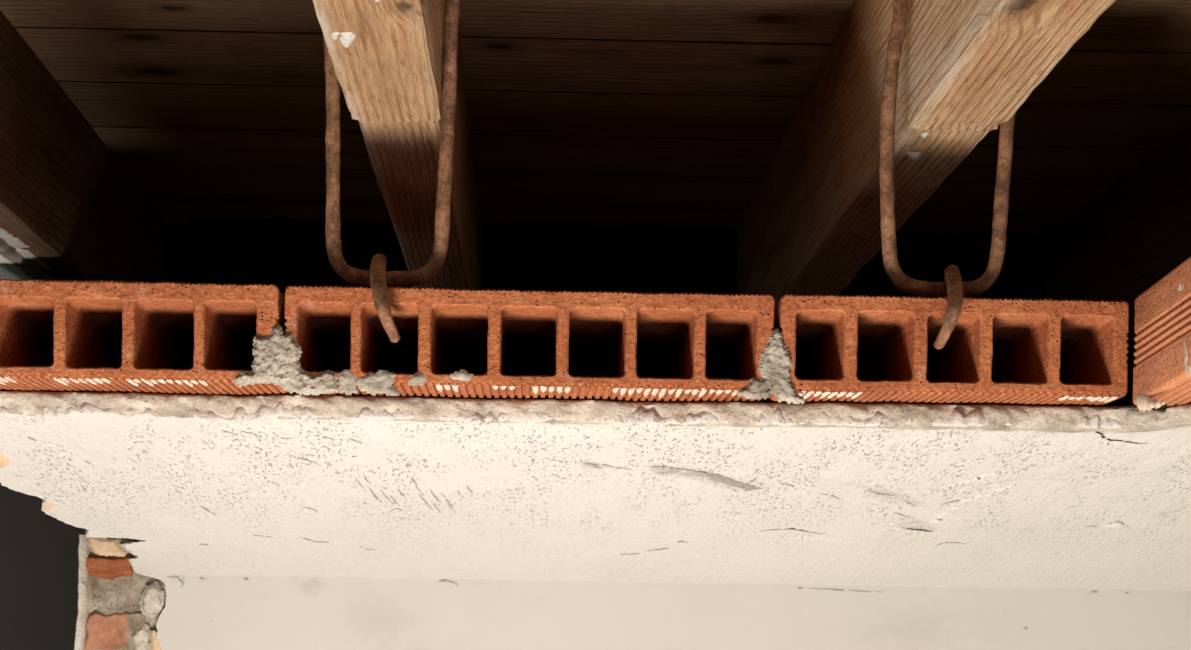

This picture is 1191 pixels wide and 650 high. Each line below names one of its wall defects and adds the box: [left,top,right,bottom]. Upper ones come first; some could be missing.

flaking render [74,535,166,650]